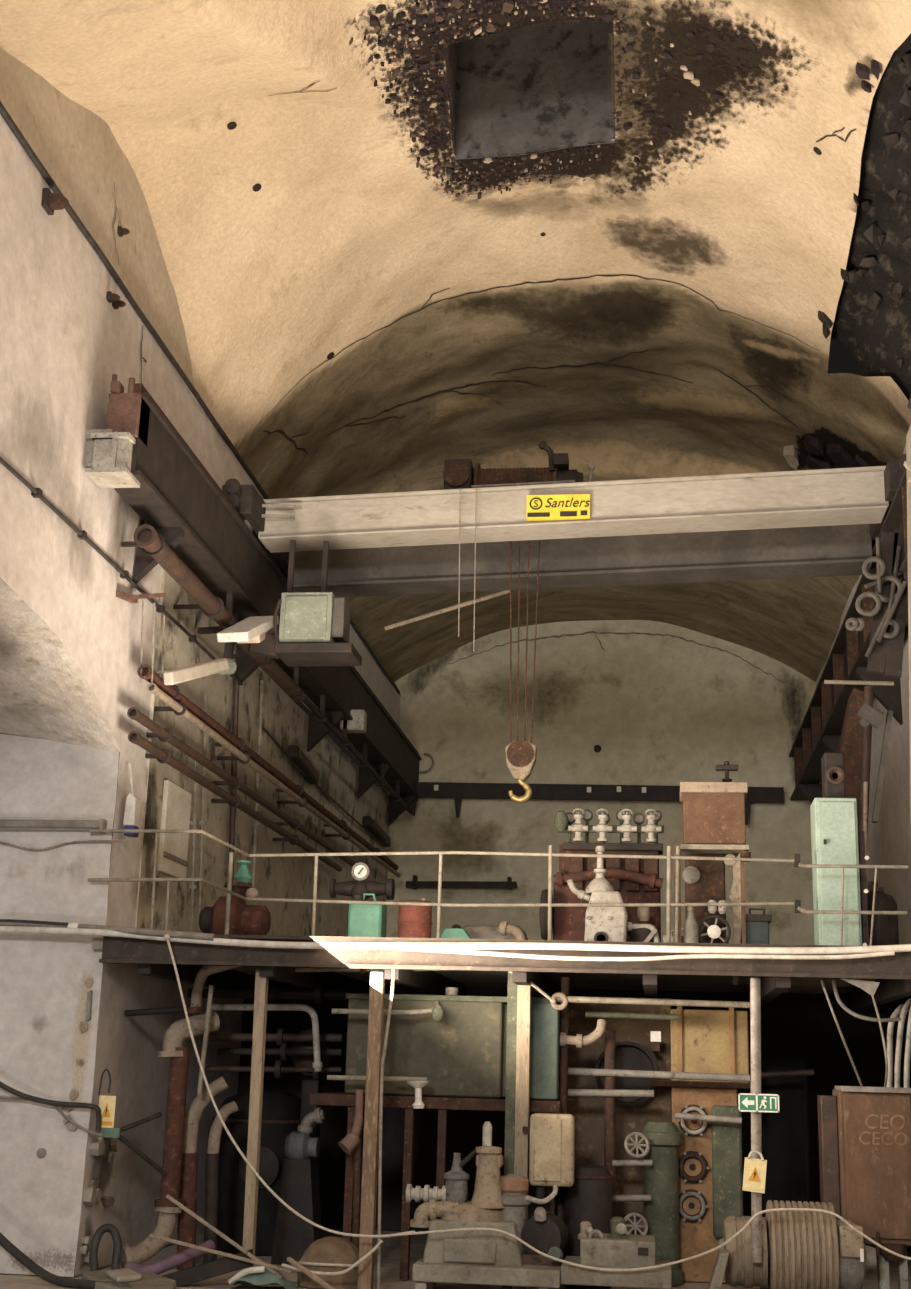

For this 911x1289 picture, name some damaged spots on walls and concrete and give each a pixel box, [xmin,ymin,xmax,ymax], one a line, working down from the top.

peeling [344,0,770,199]
spalling [818,34,911,401]
crack [259,274,820,466]